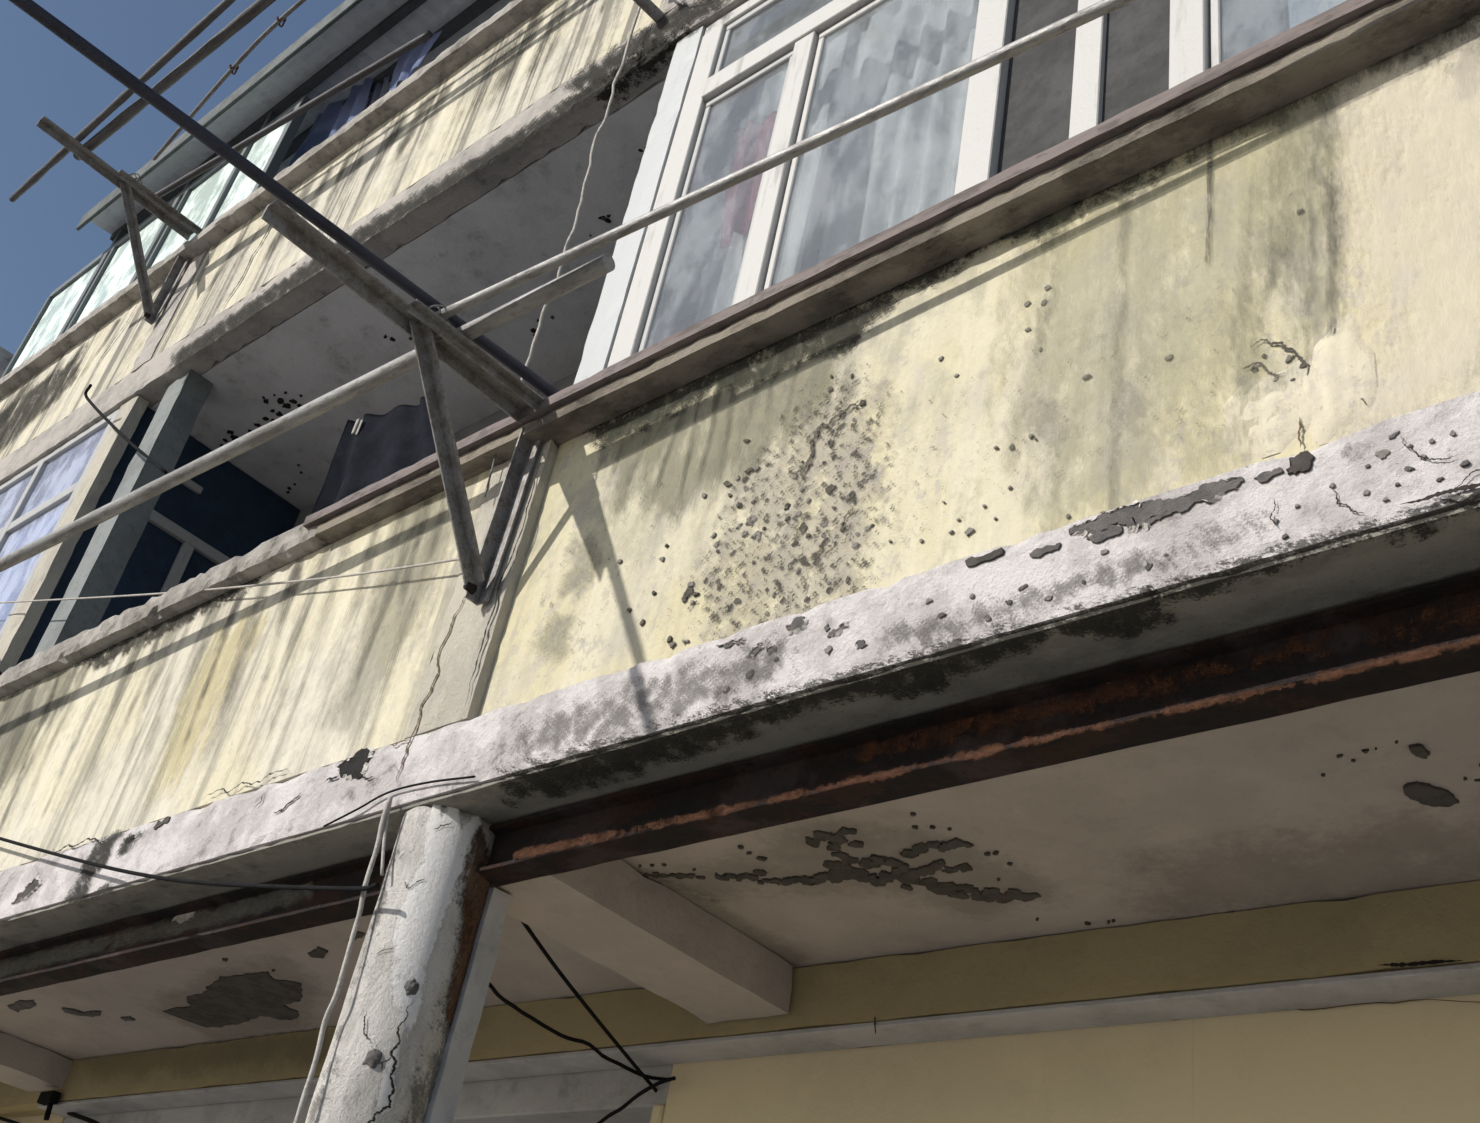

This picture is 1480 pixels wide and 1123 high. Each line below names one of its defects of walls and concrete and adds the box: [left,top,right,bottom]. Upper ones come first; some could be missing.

water stain [333,0,726,252]
water stain [534,14,1480,664]
crack [1296,417,1304,447]
peeling [1029,450,1315,558]
crack [392,447,548,781]
water stain [495,484,1480,808]
corrosion [1136,636,1480,719]
spalling [325,747,375,782]
corrosion [513,720,1114,859]
peeling [639,812,1041,904]
corrosion [446,825,490,1032]
crack [363,1000,415,1123]